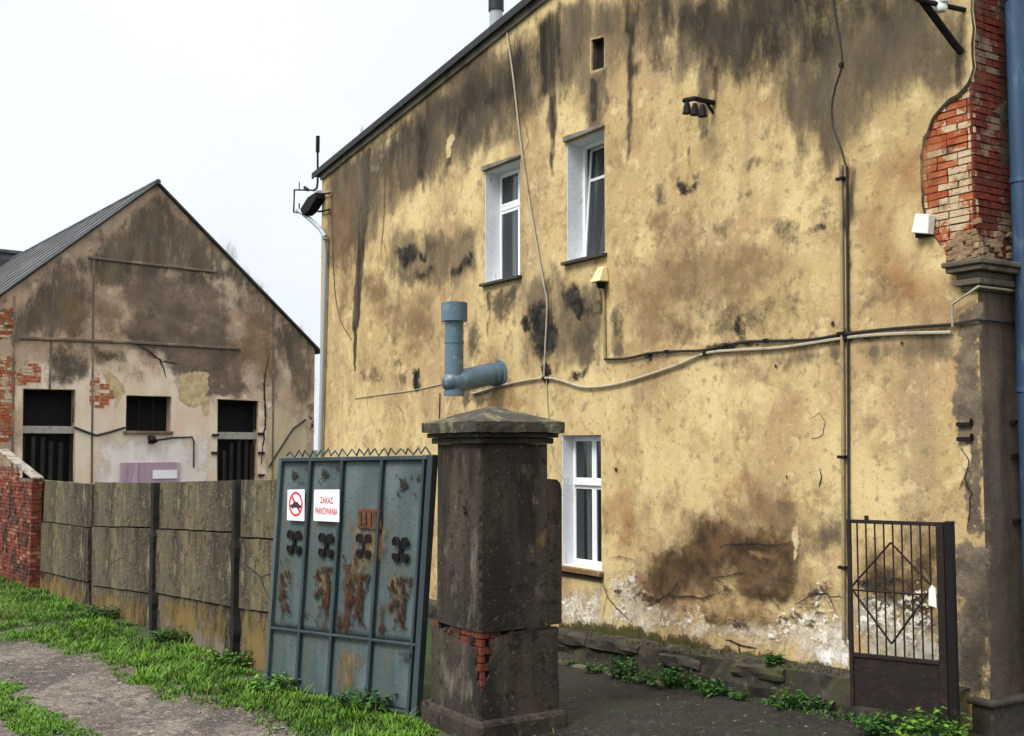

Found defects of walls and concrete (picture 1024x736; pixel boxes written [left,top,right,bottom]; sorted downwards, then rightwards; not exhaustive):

damp [537,11,579,167]
spalling [920,0,1013,262]
spalling [0,356,41,442]
spalling [89,377,114,408]
crack [137,344,179,378]
crack [261,356,269,463]
damp [340,190,475,391]
damp [486,271,623,380]
crack [959,448,973,528]
spalling [433,620,500,691]
crack [602,556,842,652]
damp [562,494,939,667]